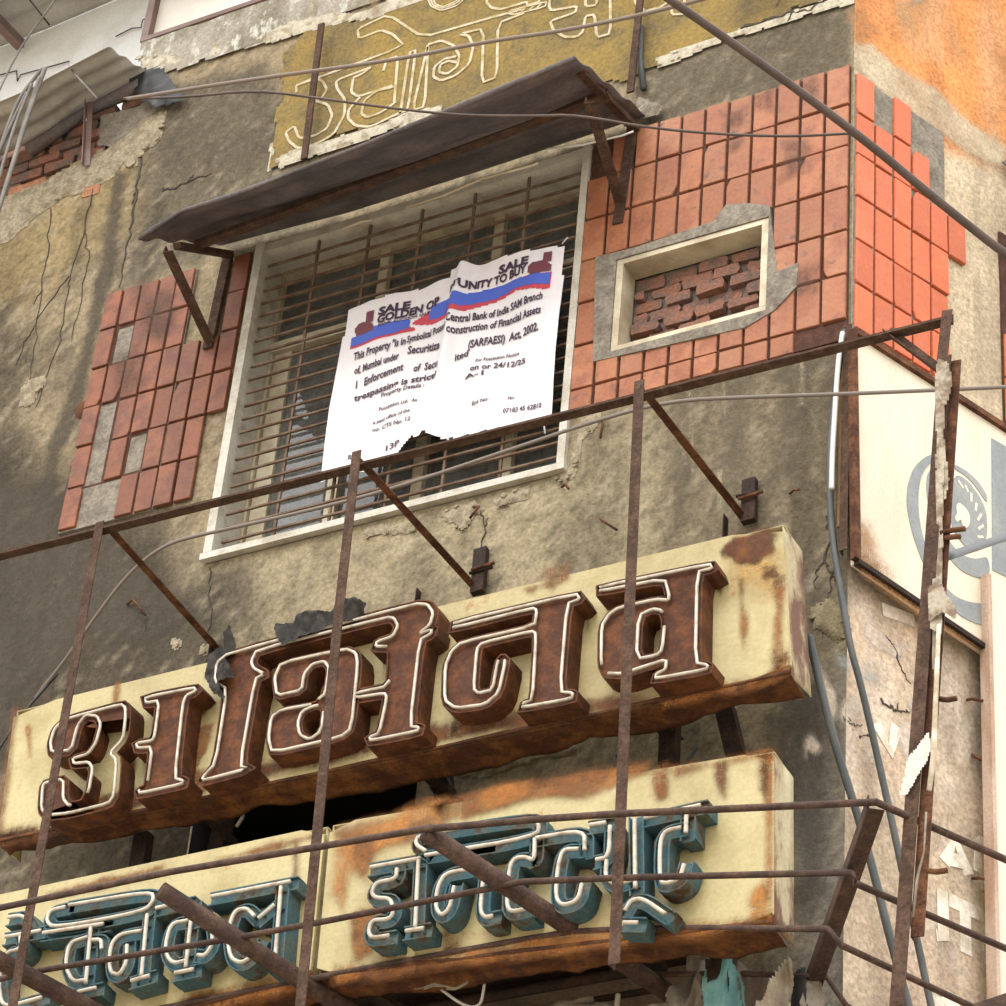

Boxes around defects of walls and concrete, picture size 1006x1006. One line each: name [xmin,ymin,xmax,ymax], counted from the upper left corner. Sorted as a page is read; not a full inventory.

peeling [134,54,180,69]
peeling [210,0,422,56]
peeling [656,0,854,68]
spalling [0,101,178,244]
peeling [267,105,442,172]
crack [15,189,93,408]
crack [880,635,911,713]
crack [842,716,869,739]